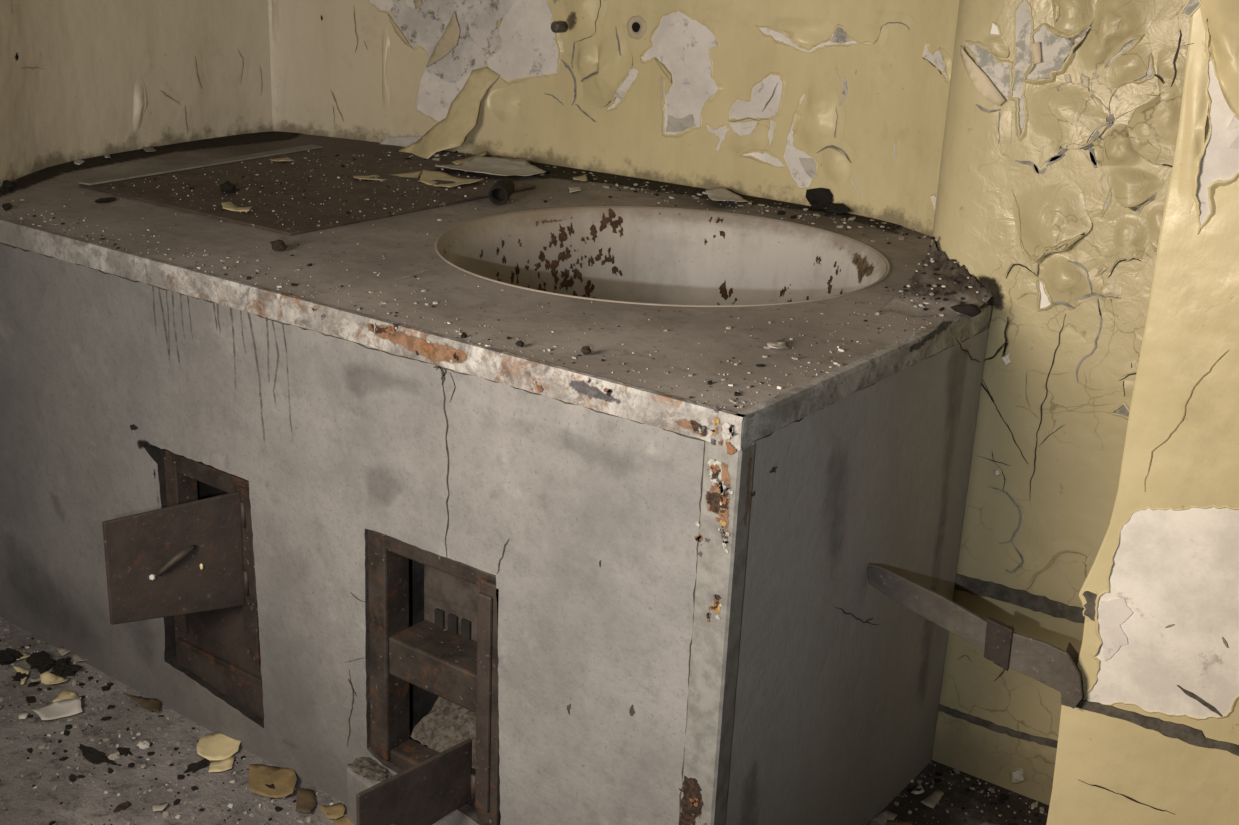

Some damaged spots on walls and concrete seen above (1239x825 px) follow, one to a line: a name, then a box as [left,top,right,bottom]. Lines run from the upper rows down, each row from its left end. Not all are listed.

peeling [353,0,564,187]
peeling [606,10,819,189]
peeling [922,0,1093,142]
peeling [1179,0,1239,235]
water stain [213,302,288,406]
rust [367,323,467,363]
crack [971,29,1193,501]
crack [433,365,455,558]
rust [674,405,752,557]
crack [1018,539,1095,591]
peeling [1081,504,1239,720]
rust [679,775,707,825]